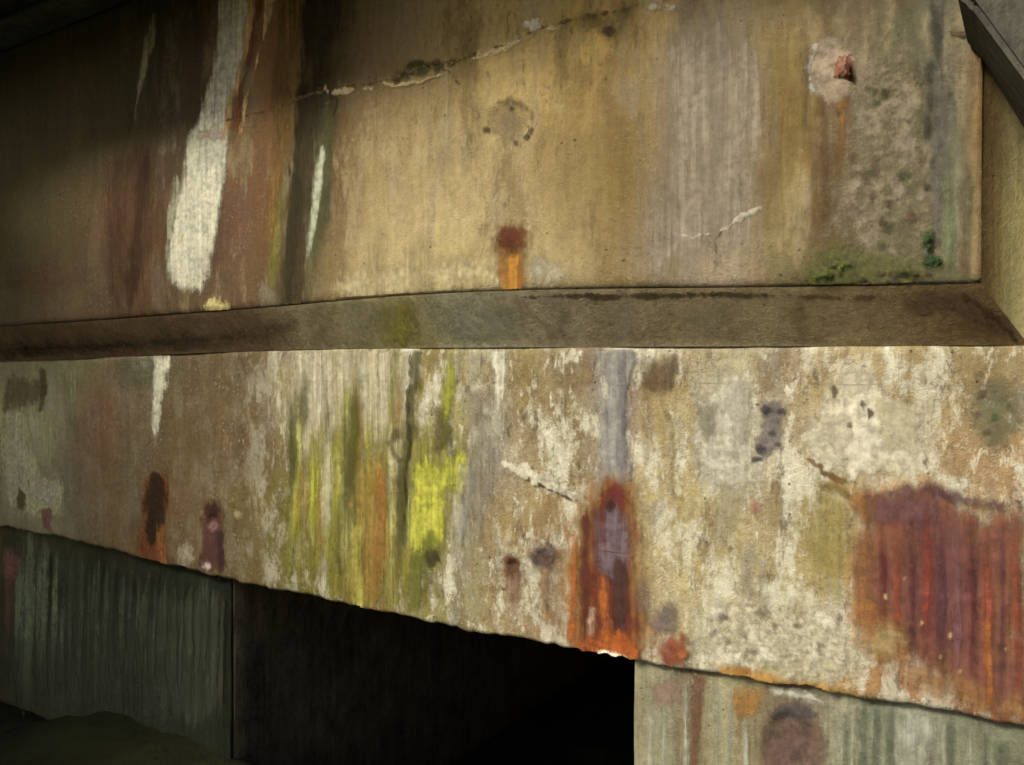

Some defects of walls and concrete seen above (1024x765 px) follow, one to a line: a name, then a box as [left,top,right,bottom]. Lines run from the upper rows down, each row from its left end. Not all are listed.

damp [166,0,354,311]
crack [226,2,675,122]
damp [804,36,858,149]
damp [924,0,954,239]
corrosion [496,227,526,289]
crack [674,206,765,252]
damp [283,349,420,529]
damp [434,408,450,449]
corrosion [138,472,168,564]
corrosion [199,501,226,572]
corrosion [502,477,688,667]
corrosion [850,483,1024,715]